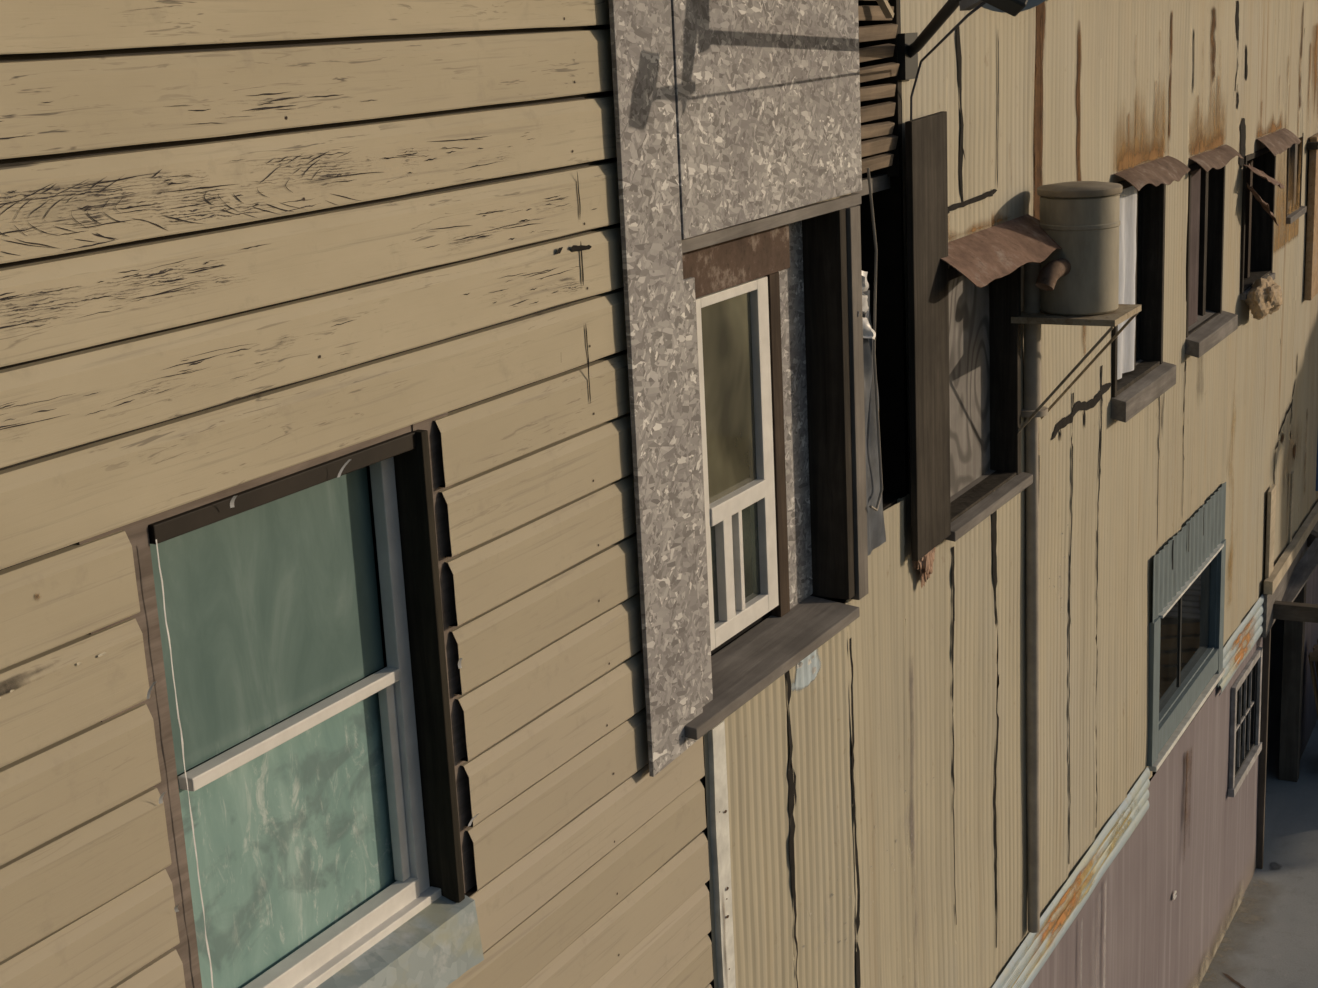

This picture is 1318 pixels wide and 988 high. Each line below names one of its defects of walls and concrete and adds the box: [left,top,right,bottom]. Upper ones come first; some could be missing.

rust [1117,12,1173,172]
rust [1191,8,1224,155]
peeling [0,136,501,257]
crack [950,546,958,925]
crack [991,510,999,948]
crack [786,671,798,988]
rust [1041,867,1086,943]